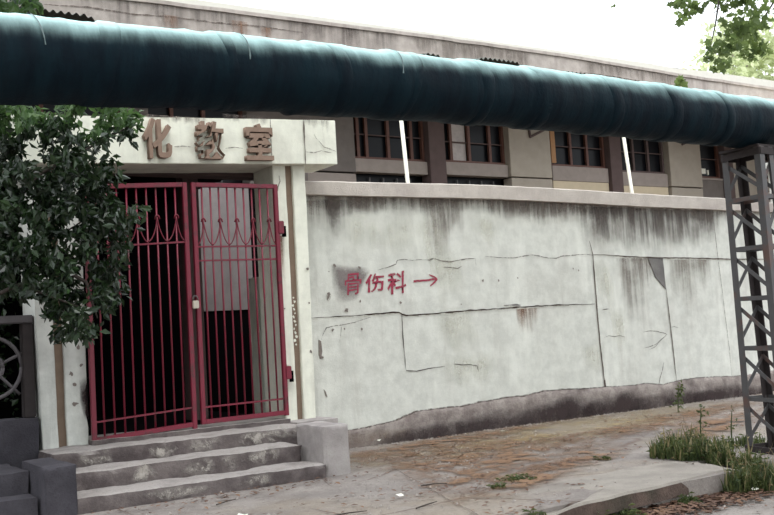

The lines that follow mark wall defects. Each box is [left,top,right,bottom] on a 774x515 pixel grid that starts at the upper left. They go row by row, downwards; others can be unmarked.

water stain [309,196,377,214]
water stain [424,198,458,227]
water stain [483,200,713,230]
crack [379,254,726,270]
water stain [622,258,650,292]
water stain [675,259,707,273]
crack [315,296,623,372]
crack [349,313,741,430]
water stain [370,385,762,444]